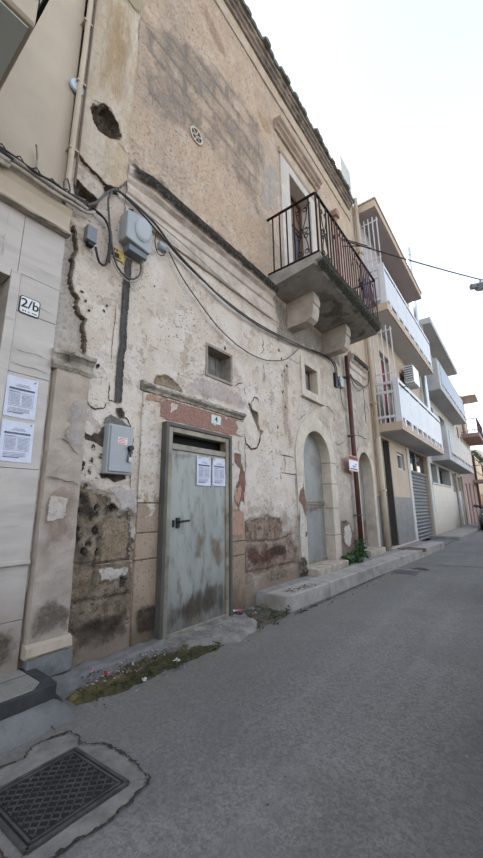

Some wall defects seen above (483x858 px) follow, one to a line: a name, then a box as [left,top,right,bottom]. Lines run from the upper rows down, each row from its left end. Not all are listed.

spalling [90,96,122,139]
leakage [150,29,278,212]
leakage [134,164,340,366]
leakage [34,601,69,634]
spalling [47,427,137,636]
leakage [77,616,125,647]
leakage [137,606,155,633]
spalling [147,374,308,589]